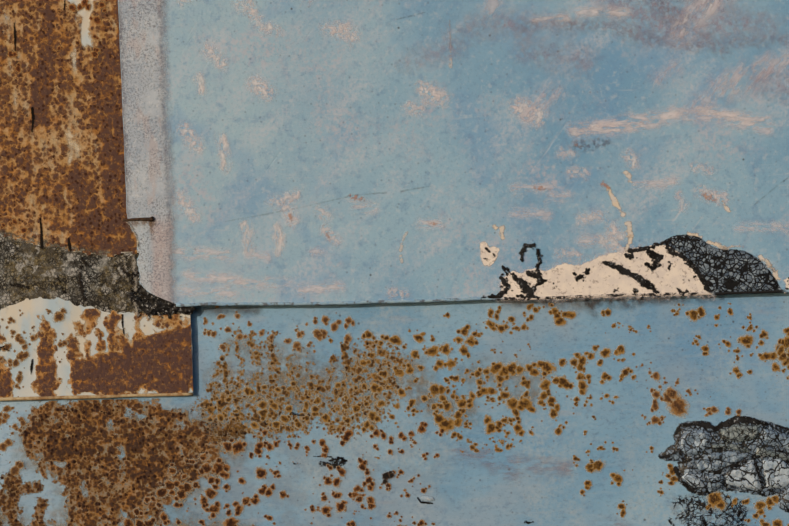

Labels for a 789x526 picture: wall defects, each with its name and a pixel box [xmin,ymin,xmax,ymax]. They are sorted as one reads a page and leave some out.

rust [0,0,152,257]
peeling [687,232,740,250]
peeling [480,221,710,300]
crack [660,234,782,292]
peeling [758,255,789,293]
rust [671,303,733,327]
rust [692,335,709,356]
rust [718,313,789,379]
rust [0,300,698,526]
rust [703,396,741,417]
crack [668,491,747,526]
rust [706,492,789,526]